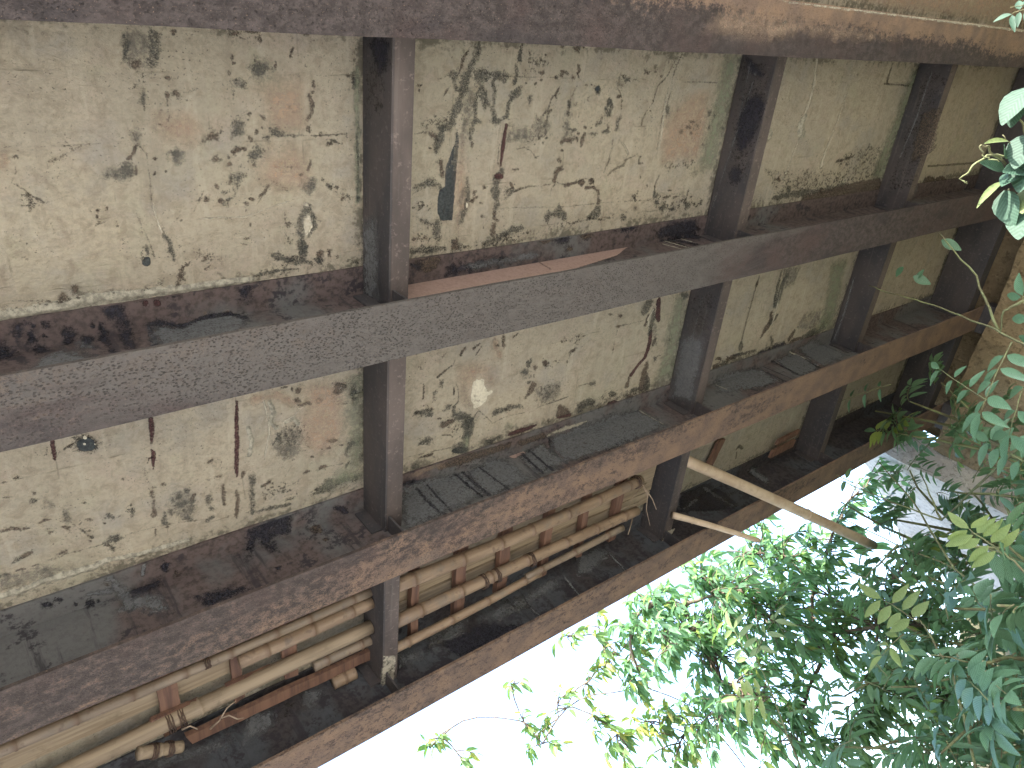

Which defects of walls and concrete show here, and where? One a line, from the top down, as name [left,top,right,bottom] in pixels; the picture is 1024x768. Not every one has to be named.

mould [106,145,138,180]
mould [121,26,177,107]
mould [202,59,361,277]
rust [497,123,510,166]
mould [422,41,662,154]
water stain [766,58,884,201]
water stain [410,168,703,253]
mould [162,232,220,281]
spalling [471,379,493,408]
rust [148,417,156,470]
water stain [241,383,363,570]
water stain [194,587,250,607]